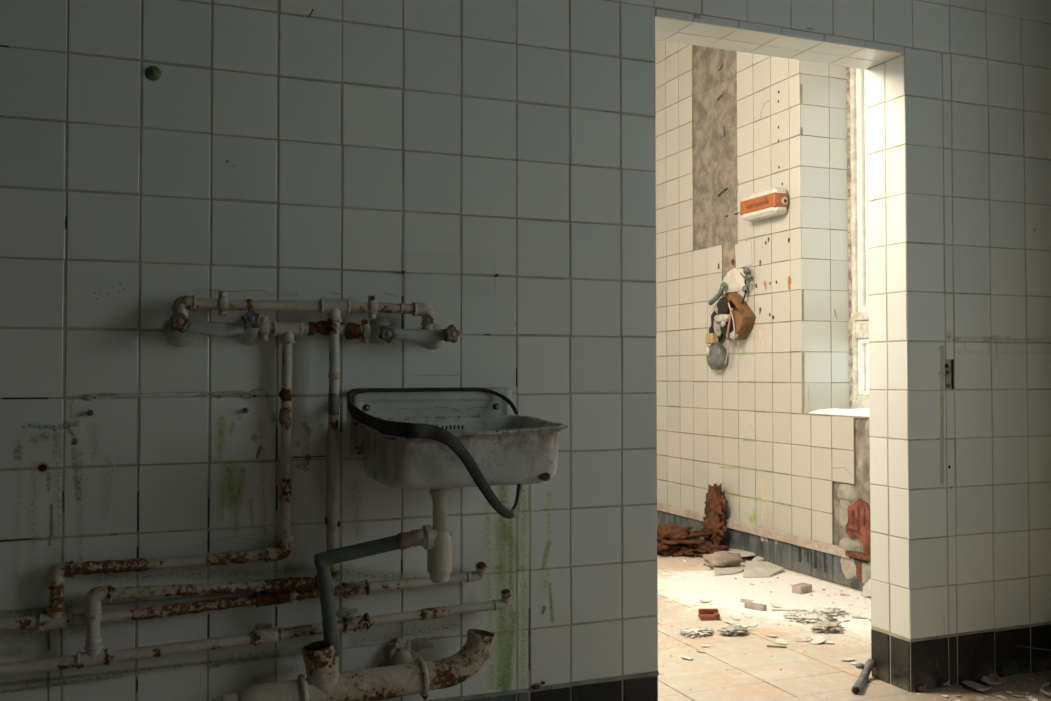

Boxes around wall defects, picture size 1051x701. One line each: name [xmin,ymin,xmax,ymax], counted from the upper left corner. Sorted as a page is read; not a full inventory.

spalling [693,47,739,278]
spalling [834,418,871,592]